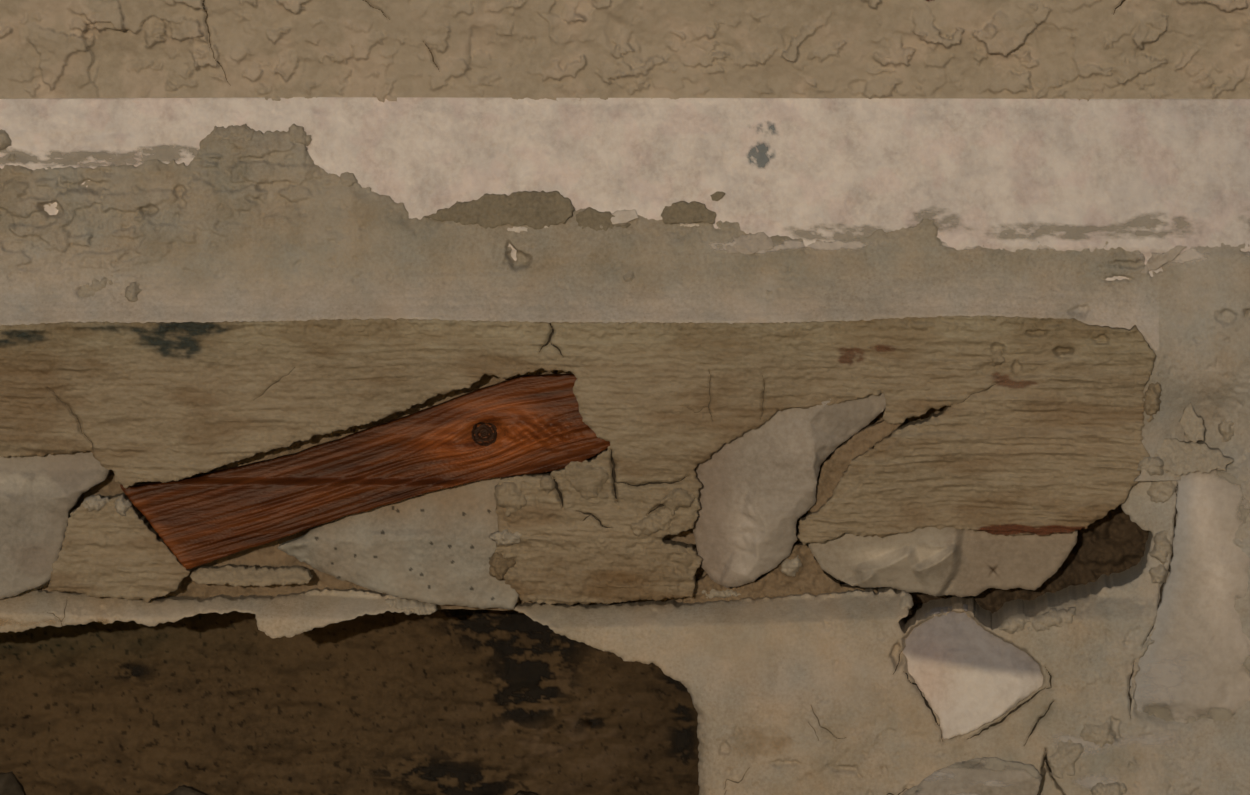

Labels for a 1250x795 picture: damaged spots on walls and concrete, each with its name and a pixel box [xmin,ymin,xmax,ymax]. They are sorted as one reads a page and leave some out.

spalling [425,190,631,233]
spalling [661,191,725,227]
crack [47,387,93,447]
spalling [191,368,572,477]
spalling [817,409,885,483]
spalling [900,406,946,426]
spalling [71,470,155,512]
crack [553,450,687,528]
spalling [162,528,386,599]
spalling [972,504,1149,614]
spalling [905,592,952,618]
crack [1128,484,1178,718]